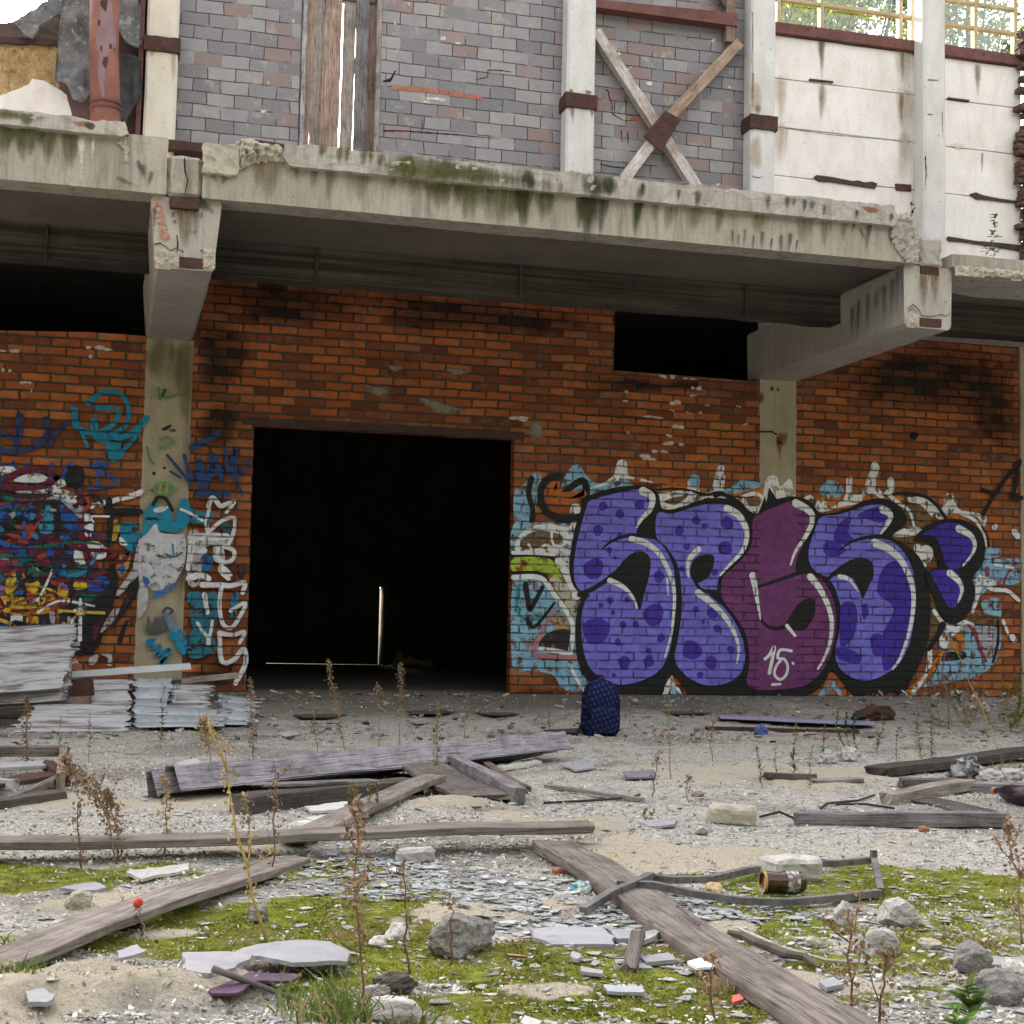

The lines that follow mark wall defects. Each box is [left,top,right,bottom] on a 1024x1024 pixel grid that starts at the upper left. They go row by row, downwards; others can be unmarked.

crack [182,158,190,194]
spalling [202,138,285,178]
leakage [412,171,553,219]
leakage [577,176,615,230]
leakage [634,183,680,227]
leakage [732,197,827,248]
spalling [154,247,181,270]
spalling [203,246,216,271]